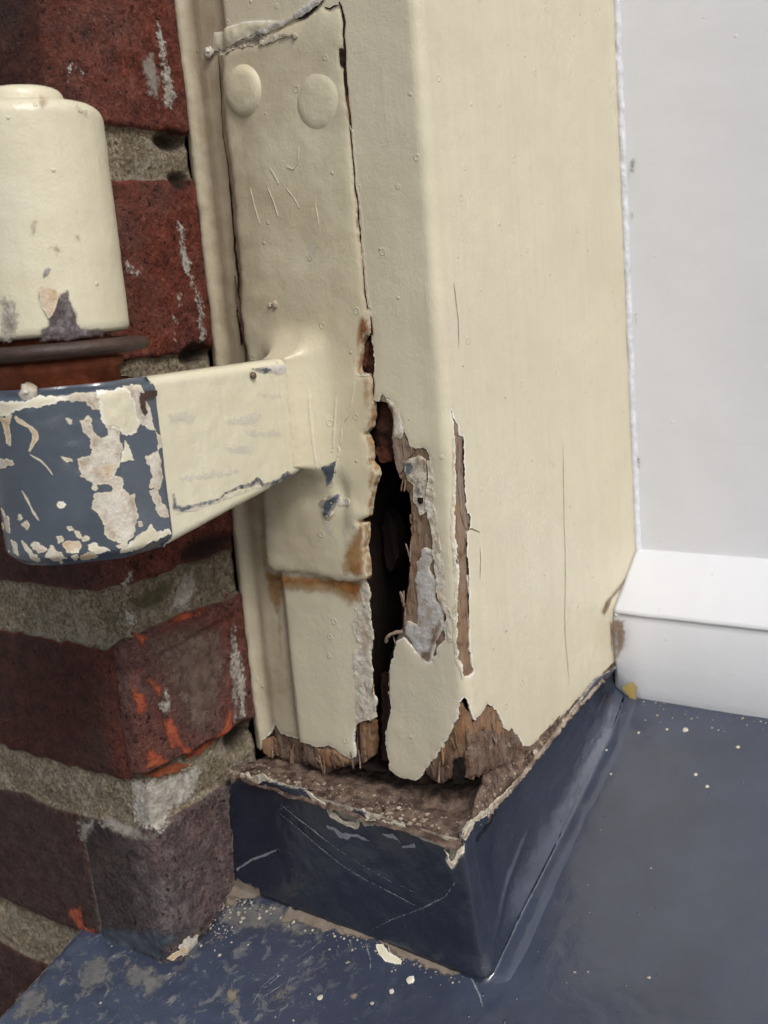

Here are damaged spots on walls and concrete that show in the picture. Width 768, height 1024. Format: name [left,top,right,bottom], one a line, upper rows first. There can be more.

peeling [204,0,324,59]
crack [325,1,373,335]
peeling [38,268,104,341]
peeling [0,384,303,564]
peeling [308,382,355,532]
spalling [357,401,413,771]
peeling [444,845,465,869]